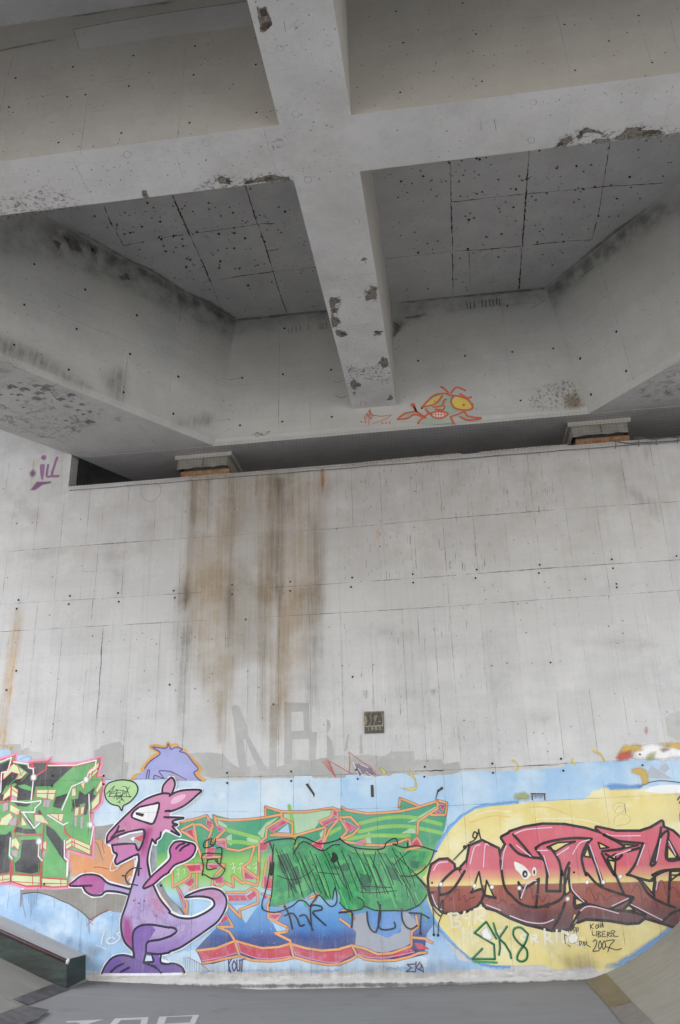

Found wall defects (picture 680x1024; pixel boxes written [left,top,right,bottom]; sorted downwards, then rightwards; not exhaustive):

spalling [255,0,282,47]
spalling [557,127,663,147]
spalling [217,170,290,185]
spalling [329,297,349,337]
spalling [348,286,396,407]